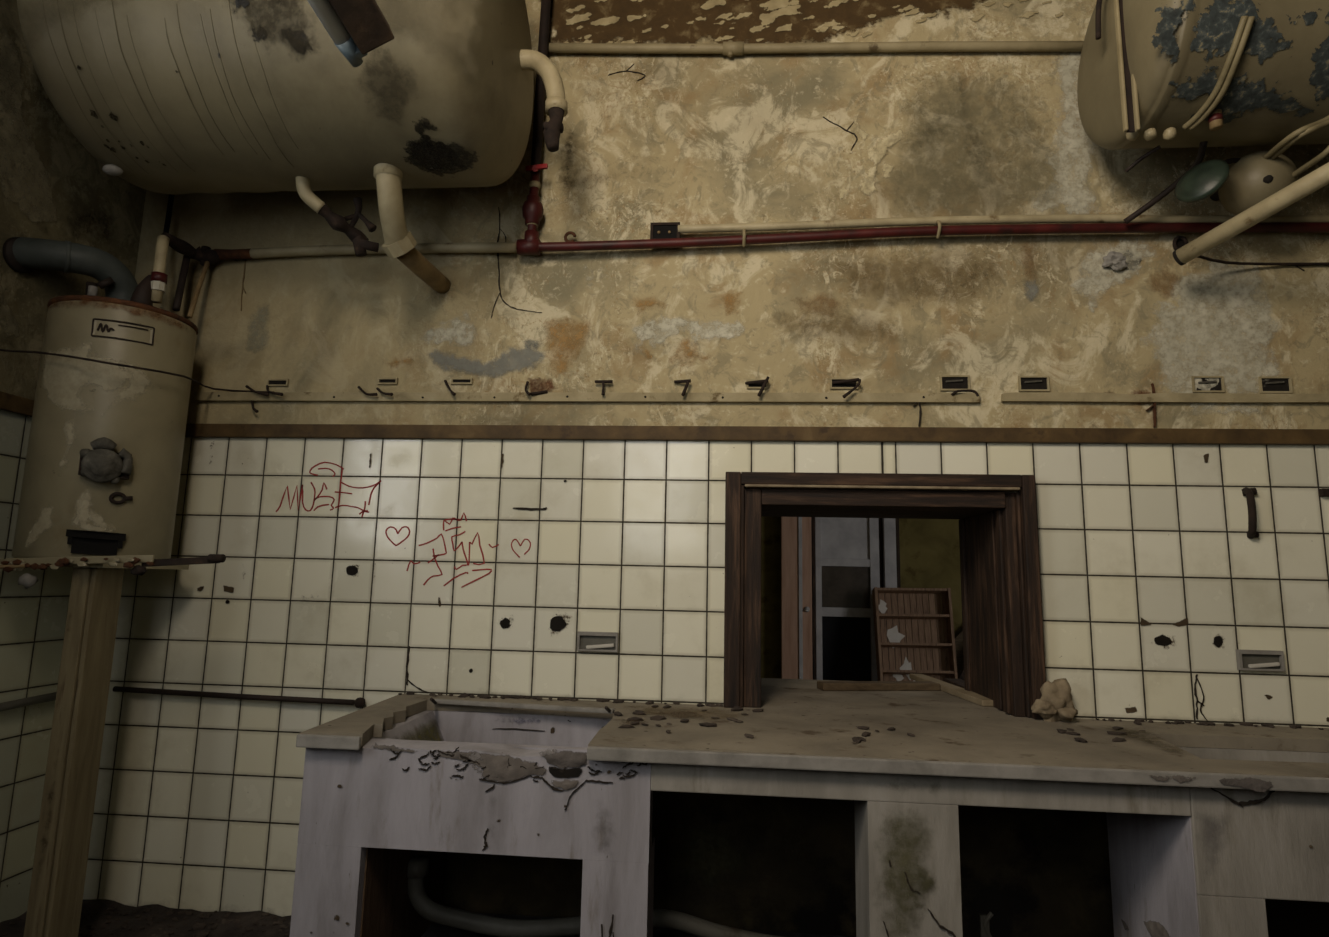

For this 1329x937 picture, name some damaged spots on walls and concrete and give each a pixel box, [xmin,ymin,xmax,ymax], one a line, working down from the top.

peeling [540,0,1063,44]
peeling [430,320,587,377]
spalling [373,743,414,753]
spalling [439,750,611,808]
damp [885,819,932,932]
crack [889,860,956,937]